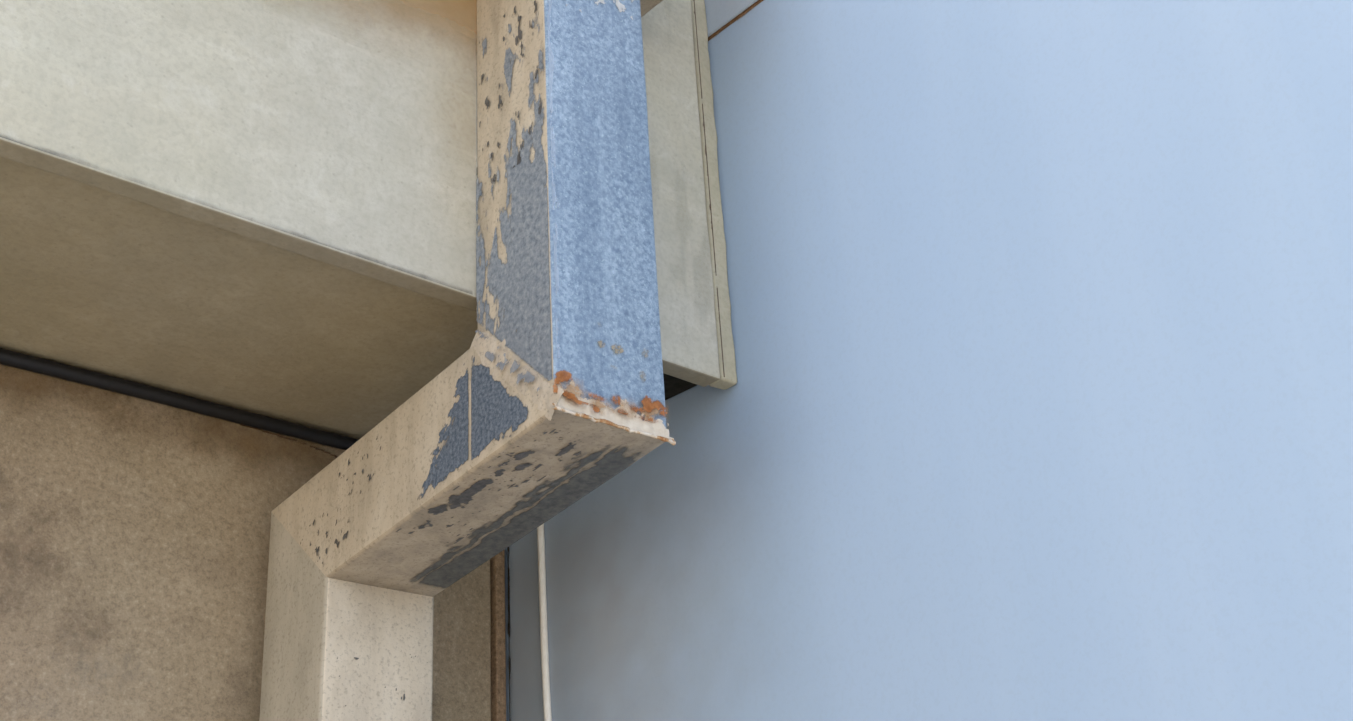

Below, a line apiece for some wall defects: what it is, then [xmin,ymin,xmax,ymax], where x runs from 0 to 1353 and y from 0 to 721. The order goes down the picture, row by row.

peeling [396,0,669,588]
corrosion [553,370,668,422]
peeling [300,513,348,563]